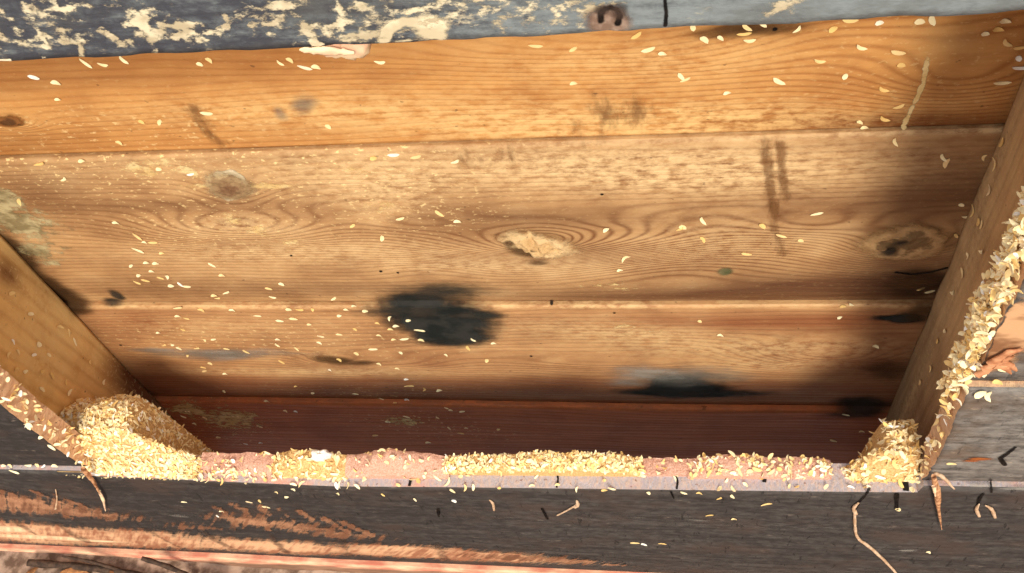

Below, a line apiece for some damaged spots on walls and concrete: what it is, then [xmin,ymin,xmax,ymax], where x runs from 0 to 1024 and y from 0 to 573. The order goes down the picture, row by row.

peeling [0,0,92,58]
peeling [97,0,538,61]
peeling [551,0,617,27]
damp [762,143,787,213]
damp [371,286,501,346]
damp [619,370,762,398]